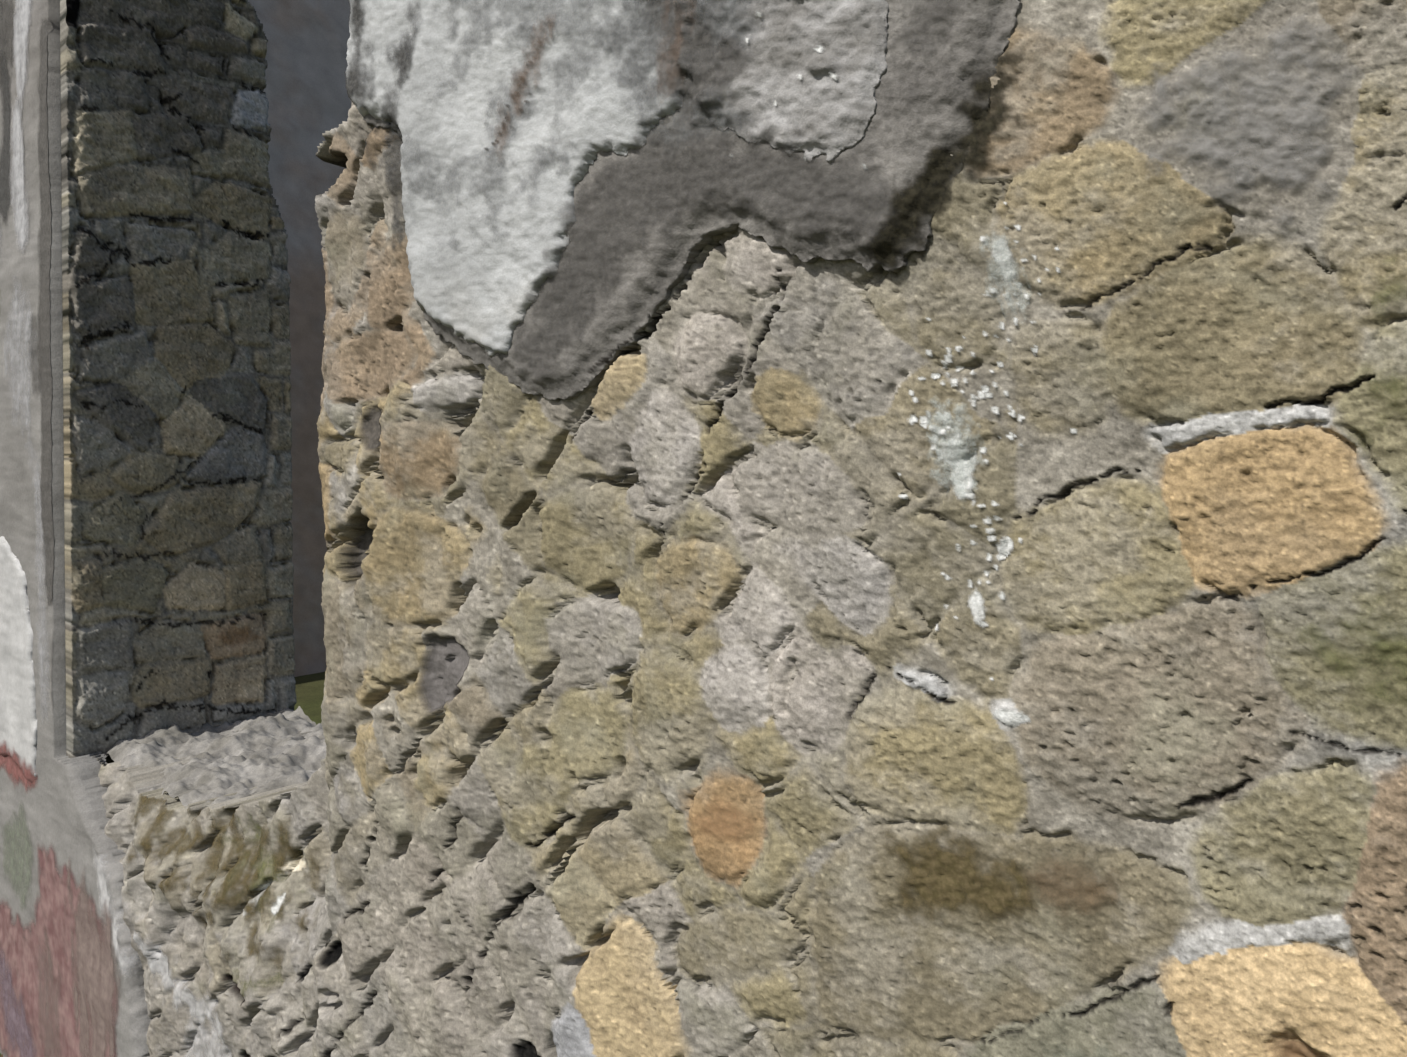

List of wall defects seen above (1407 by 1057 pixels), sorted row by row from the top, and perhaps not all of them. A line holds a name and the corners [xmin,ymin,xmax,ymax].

flaking render [345,0,1022,401]
damp [980,225,1059,341]
crack [1082,243,1212,310]
damp [909,336,1025,626]
damp [994,709,1030,725]